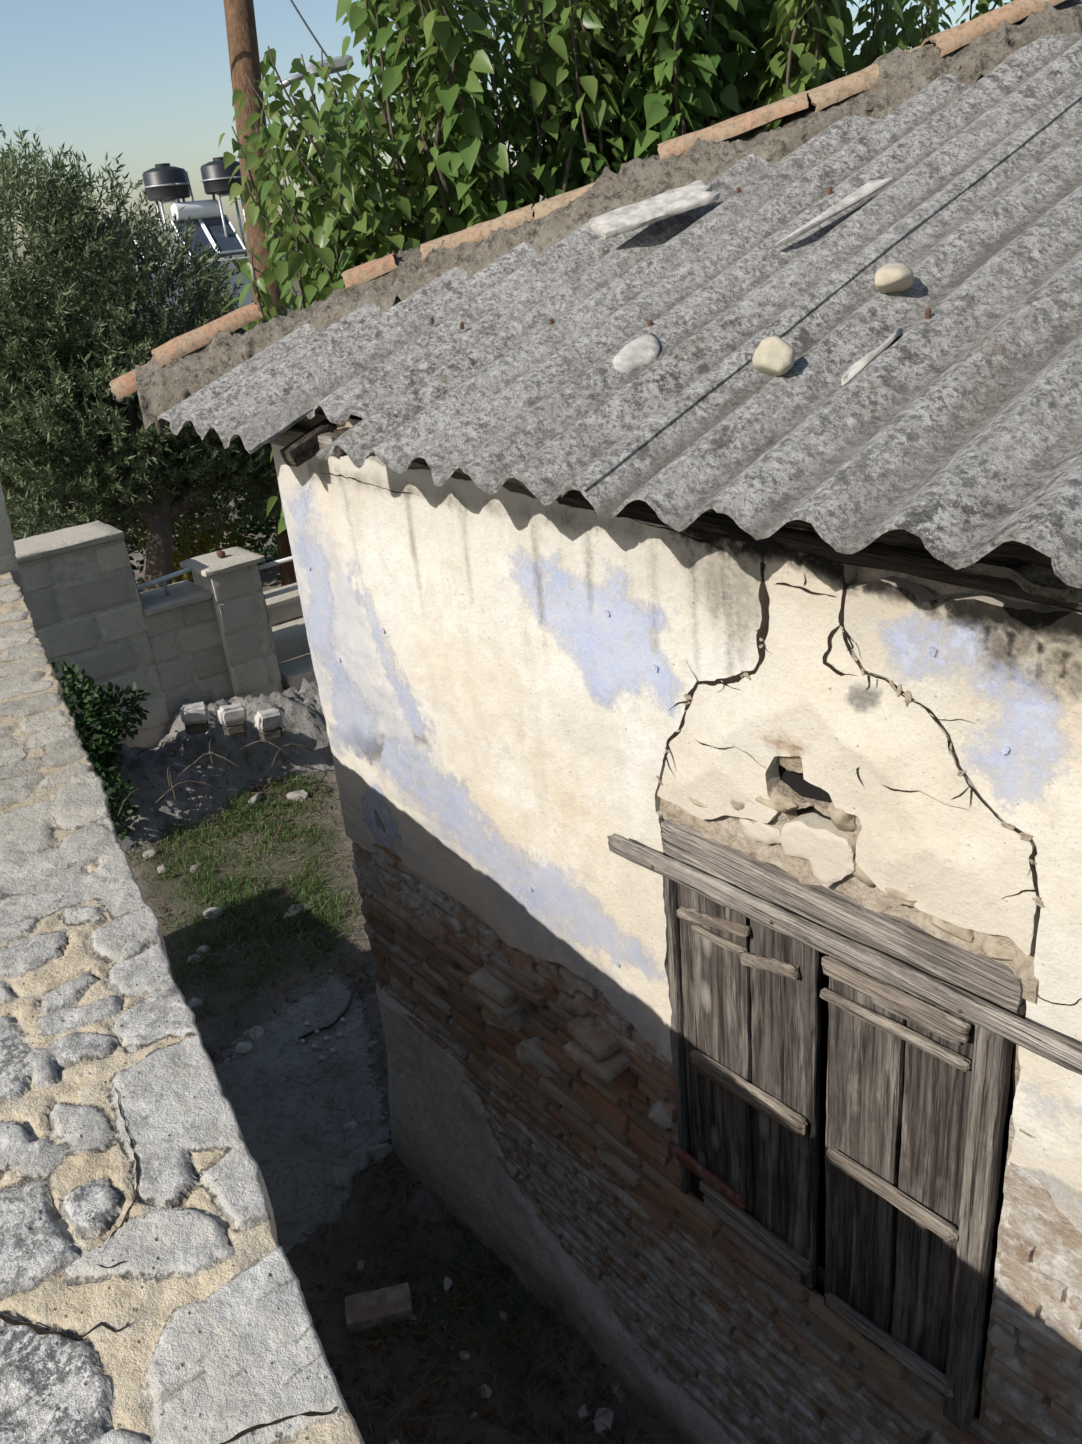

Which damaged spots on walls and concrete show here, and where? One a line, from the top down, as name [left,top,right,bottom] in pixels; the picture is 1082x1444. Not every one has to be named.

crack [615,516,726,551]
leakage [679,526,1082,676]
crack [656,562,1044,936]
flaking render [352,756,1082,1444]
crack [219,1387,354,1444]